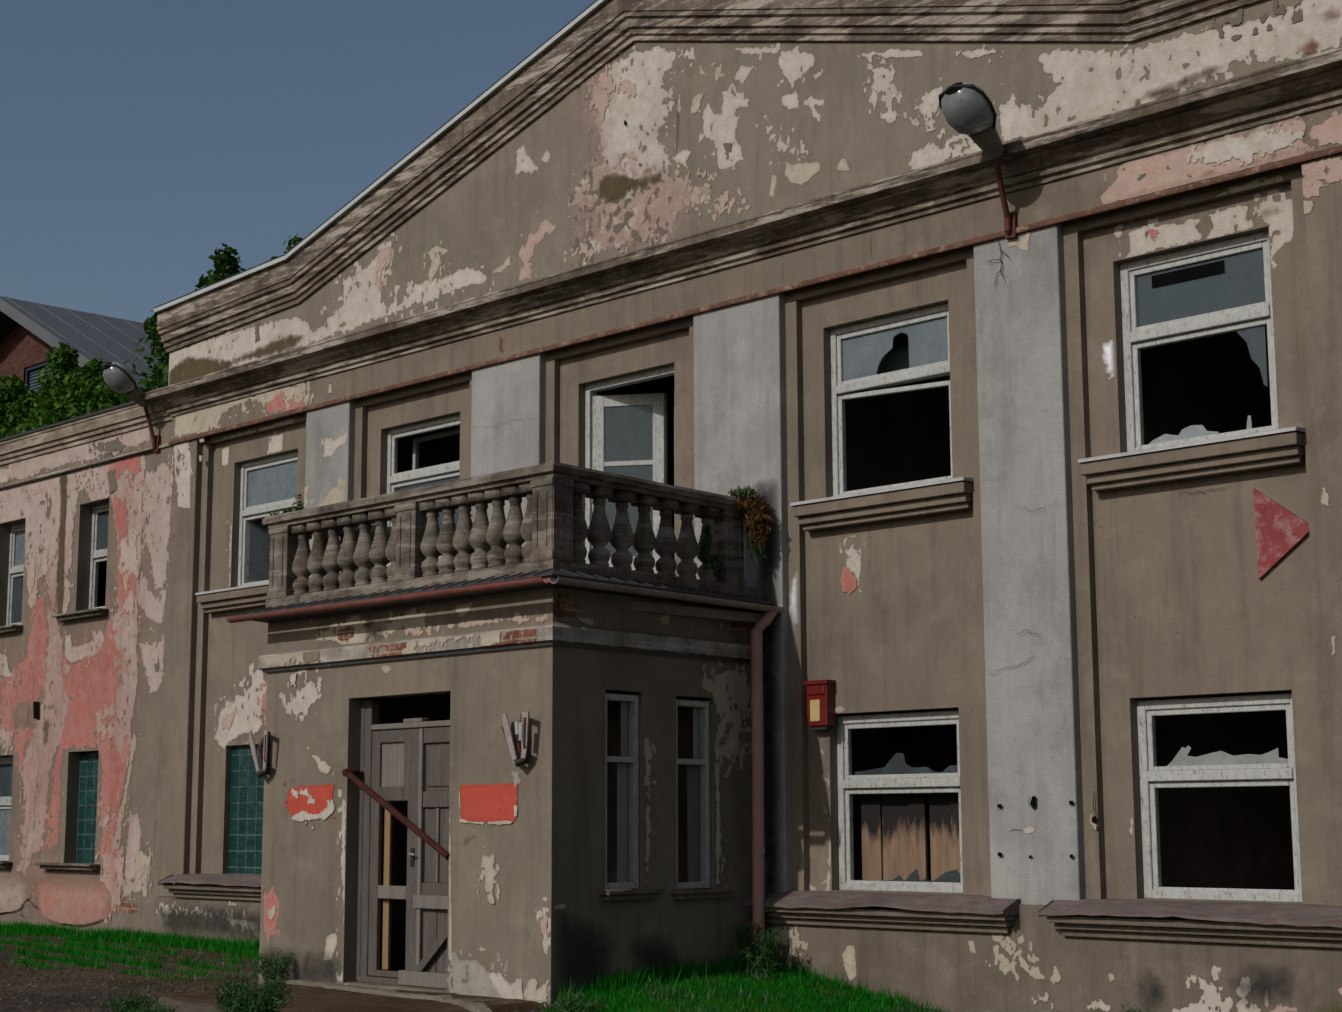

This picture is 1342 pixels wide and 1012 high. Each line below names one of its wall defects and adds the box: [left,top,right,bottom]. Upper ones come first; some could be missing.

peeling [857,48,982,170]
peeling [993,0,1342,142]
peeling [168,41,824,386]
peeling [1100,111,1342,268]
peeling [840,535,865,594]
peeling [0,381,332,944]
peeling [214,592,594,751]
peeling [701,661,752,888]
flaking render [447,783,550,1008]
peeling [968,929,1061,1010]
peeling [1172,966,1298,1012]